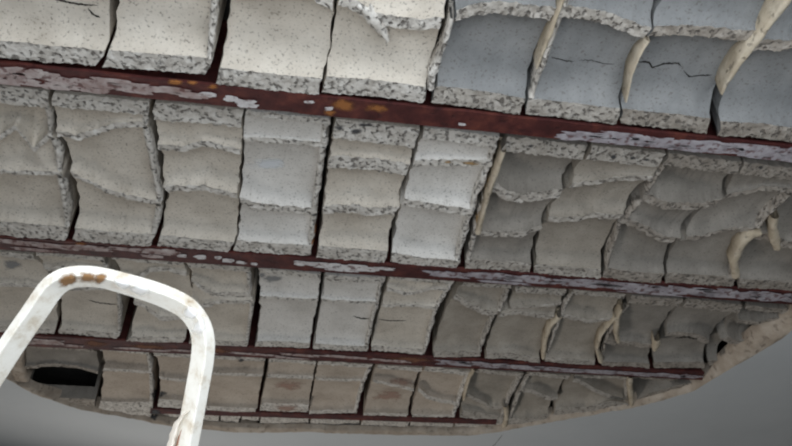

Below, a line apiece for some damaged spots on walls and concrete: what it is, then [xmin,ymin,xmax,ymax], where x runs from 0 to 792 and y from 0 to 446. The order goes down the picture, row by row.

crack [57,0,100,18]
crack [638,61,710,77]
peeling [0,67,259,108]
corrosion [325,100,352,115]
peeling [556,131,792,169]
peeling [0,239,258,266]
peeling [293,261,395,272]
peeling [29,339,83,348]
flaking render [202,270,792,436]
flaking render [6,373,190,446]